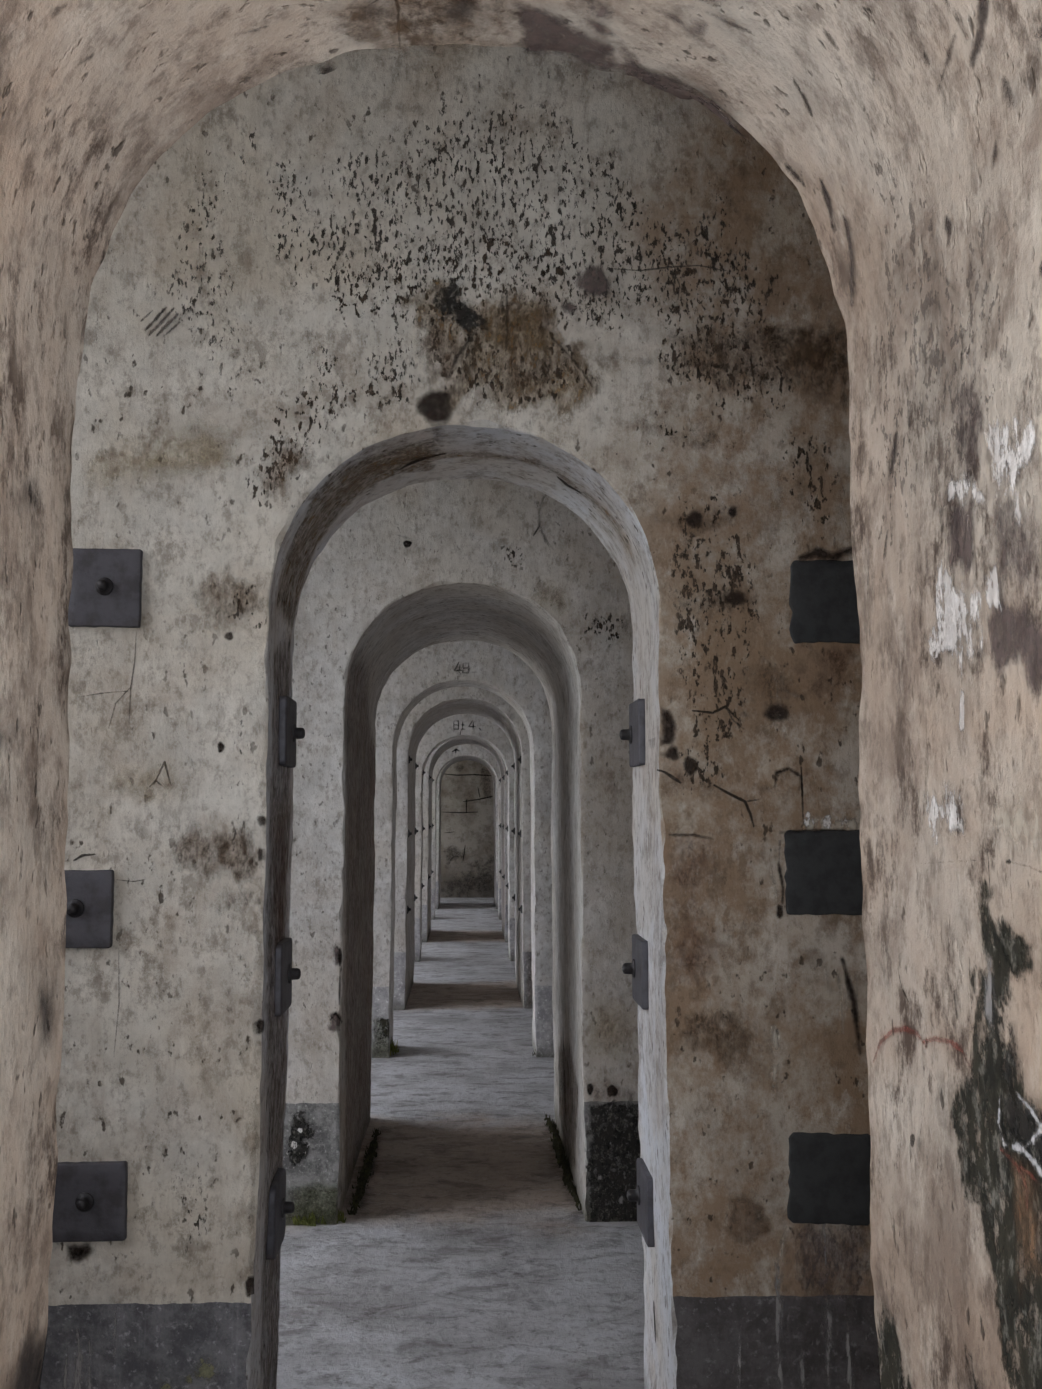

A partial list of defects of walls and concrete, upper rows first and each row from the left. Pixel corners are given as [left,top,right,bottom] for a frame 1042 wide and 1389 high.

damp [154,172,239,366]
damp [246,92,848,506]
damp [783,433,836,540]
damp [950,861,1042,1389]